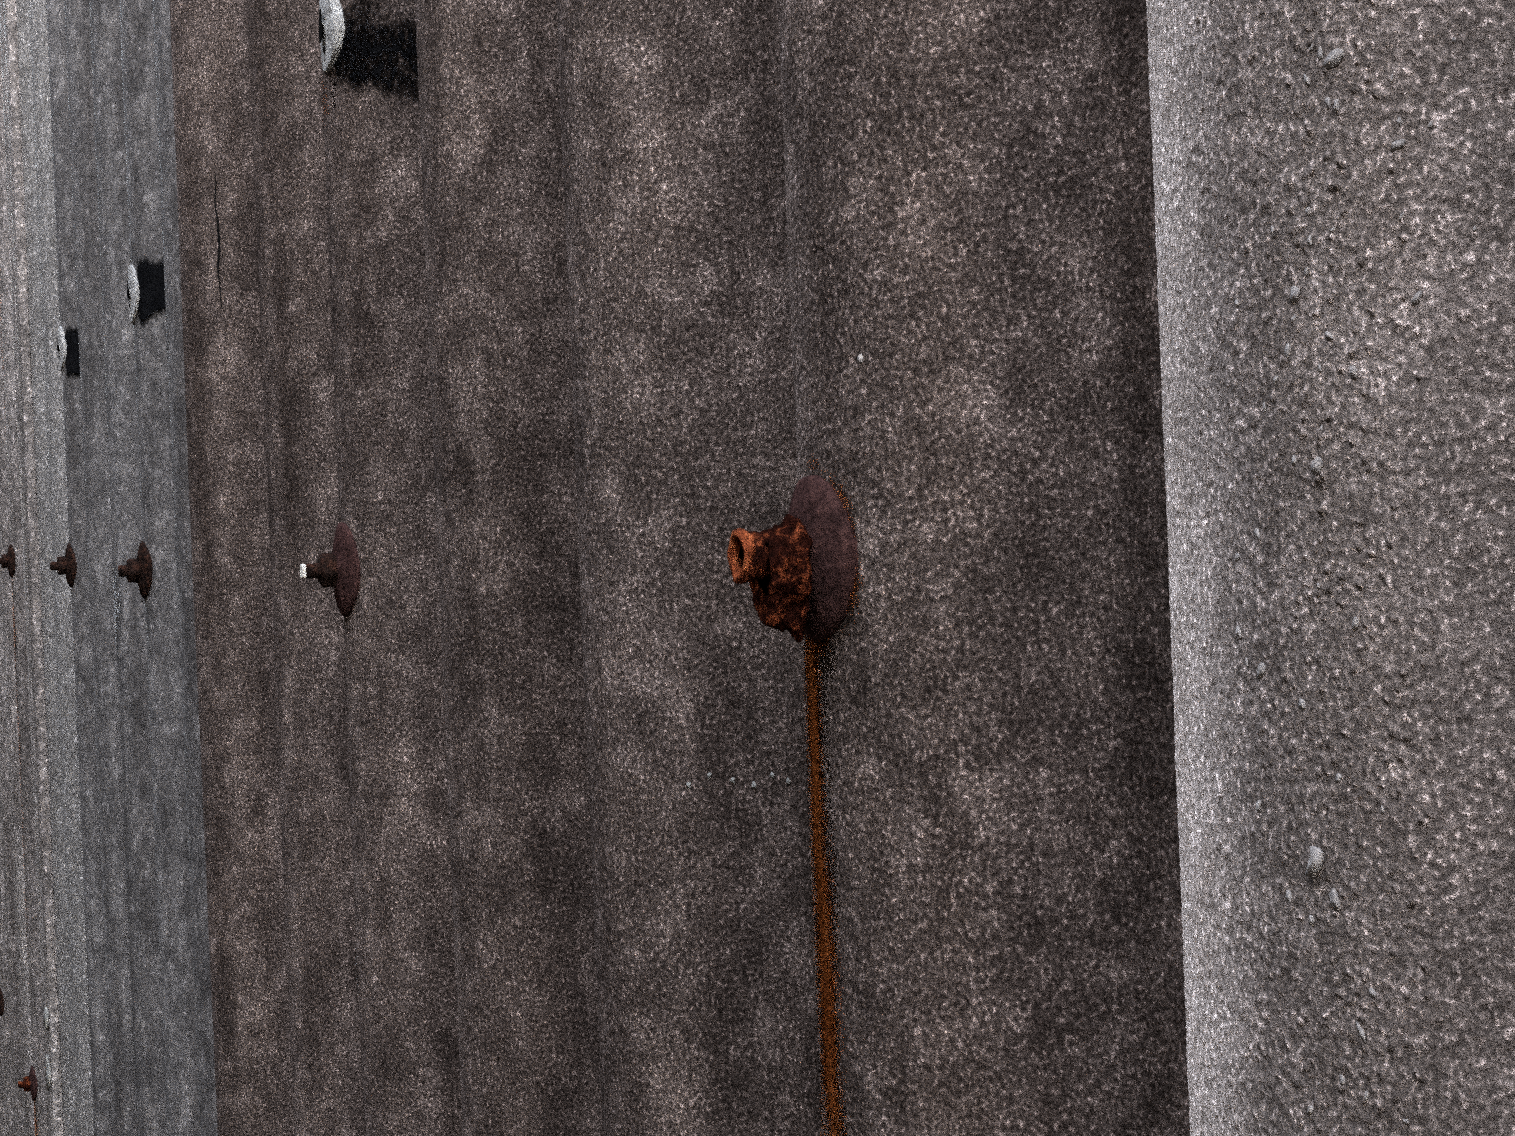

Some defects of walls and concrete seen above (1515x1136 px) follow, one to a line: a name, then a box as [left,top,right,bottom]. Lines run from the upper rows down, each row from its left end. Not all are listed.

rust [804,635,846,1136]